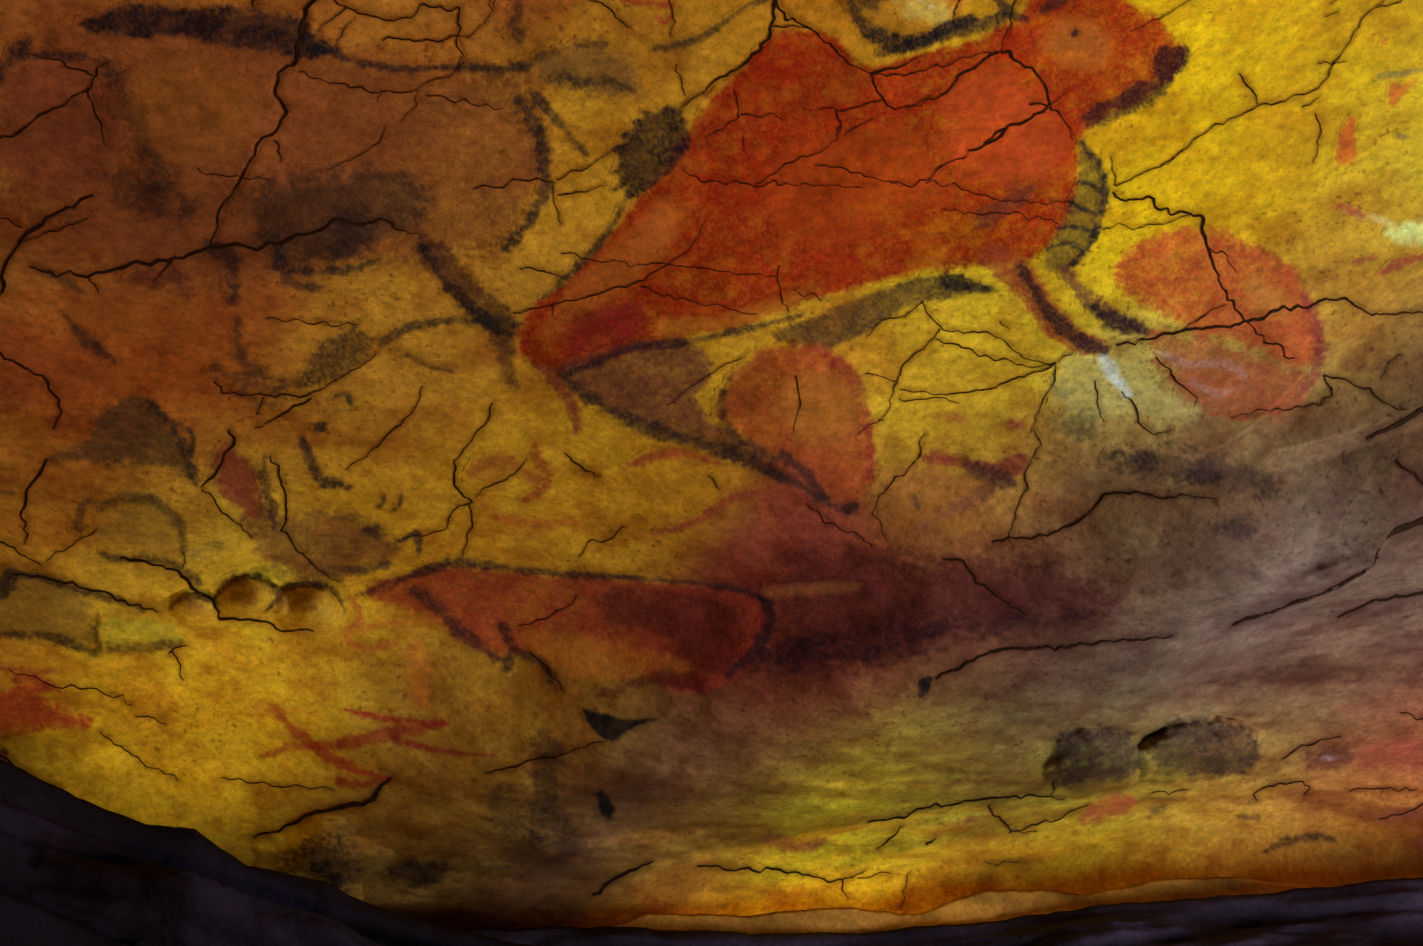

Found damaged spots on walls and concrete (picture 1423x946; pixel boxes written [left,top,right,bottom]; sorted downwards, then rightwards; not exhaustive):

crack [0,0,503,295]
crack [473,150,822,316]
crack [669,0,1073,225]
crack [1095,0,1423,436]
crack [0,352,157,613]
crack [120,552,314,632]
crack [202,353,377,581]
crack [403,403,528,556]
crack [806,301,1215,680]
crack [1232,354,1423,627]
crack [9,669,178,781]
crack [222,776,392,838]